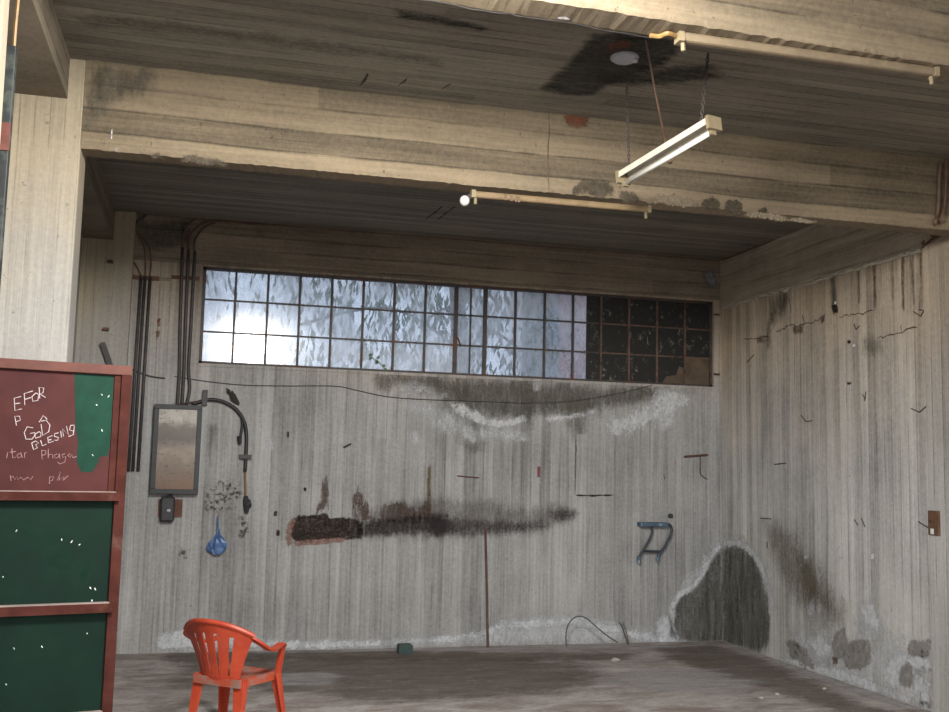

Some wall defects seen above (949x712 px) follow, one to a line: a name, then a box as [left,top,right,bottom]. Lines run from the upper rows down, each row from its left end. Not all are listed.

leakage [541,33,717,96]
spalling [572,179,816,223]
leakage [378,376,693,443]
leakage [353,489,432,523]
leakage [243,537,932,712]
leakage [157,630,234,686]
spalling [787,640,814,669]
spalling [832,628,871,670]
spalling [899,639,930,687]